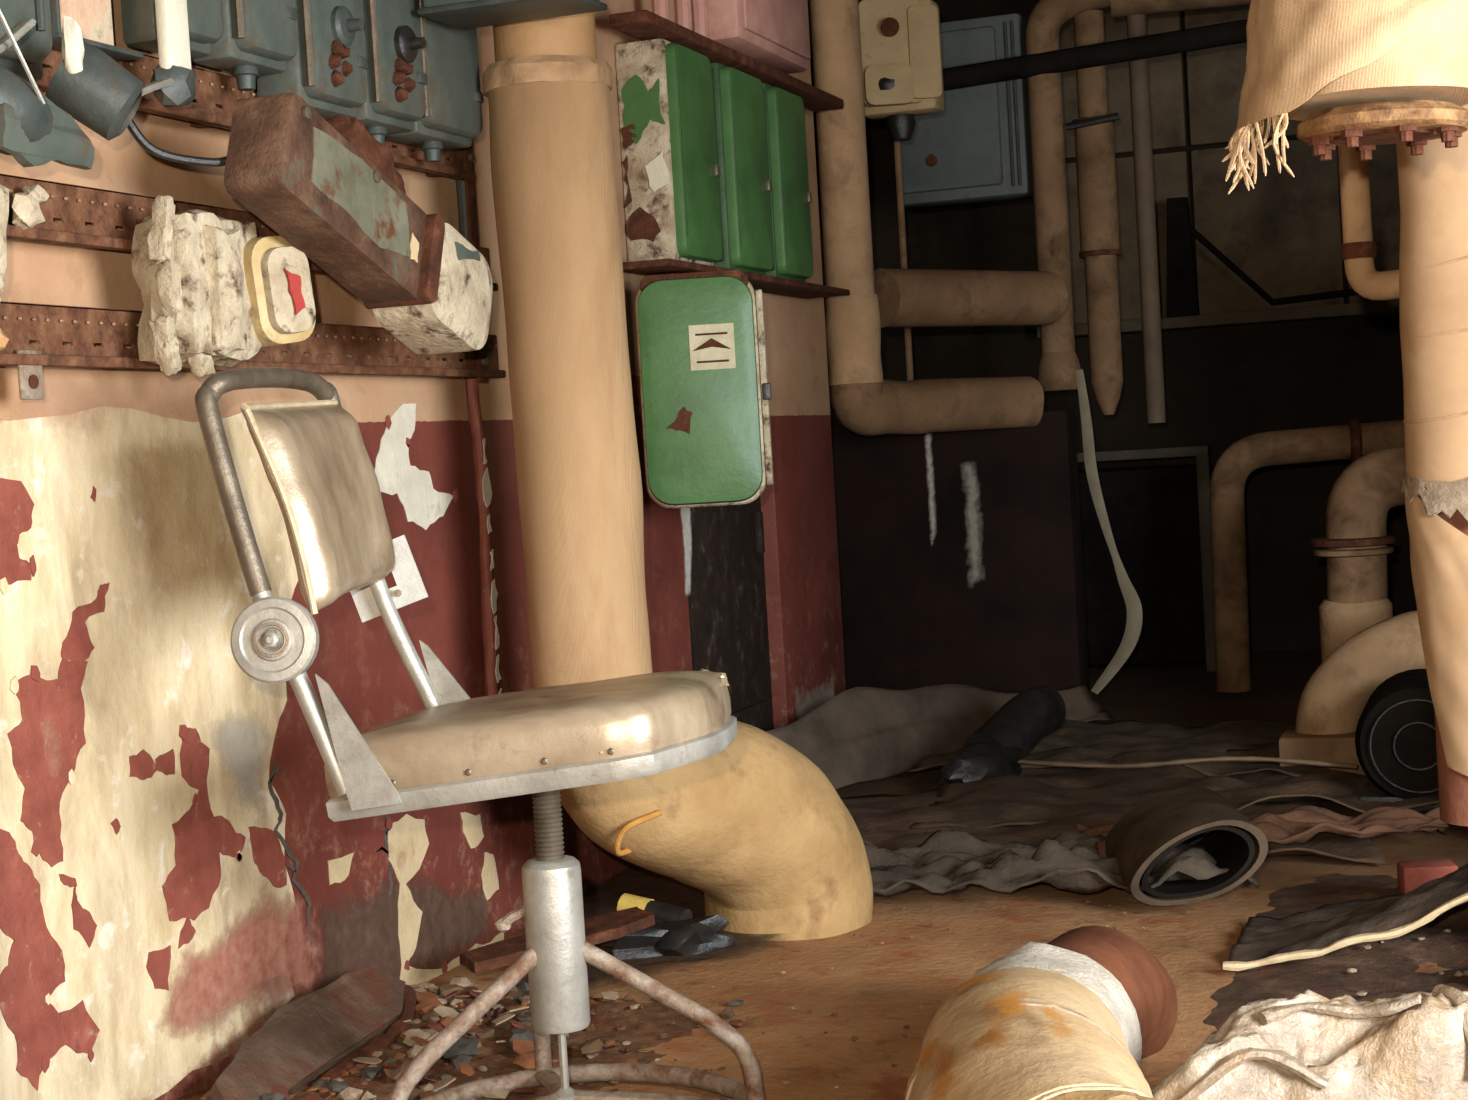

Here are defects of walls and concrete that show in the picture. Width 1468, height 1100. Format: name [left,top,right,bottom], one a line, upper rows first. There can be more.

peeling [374,403,458,530]
peeling [482,438,502,694]
peeling [0,406,320,1100]
peeling [328,852,354,885]
peeling [386,812,504,989]